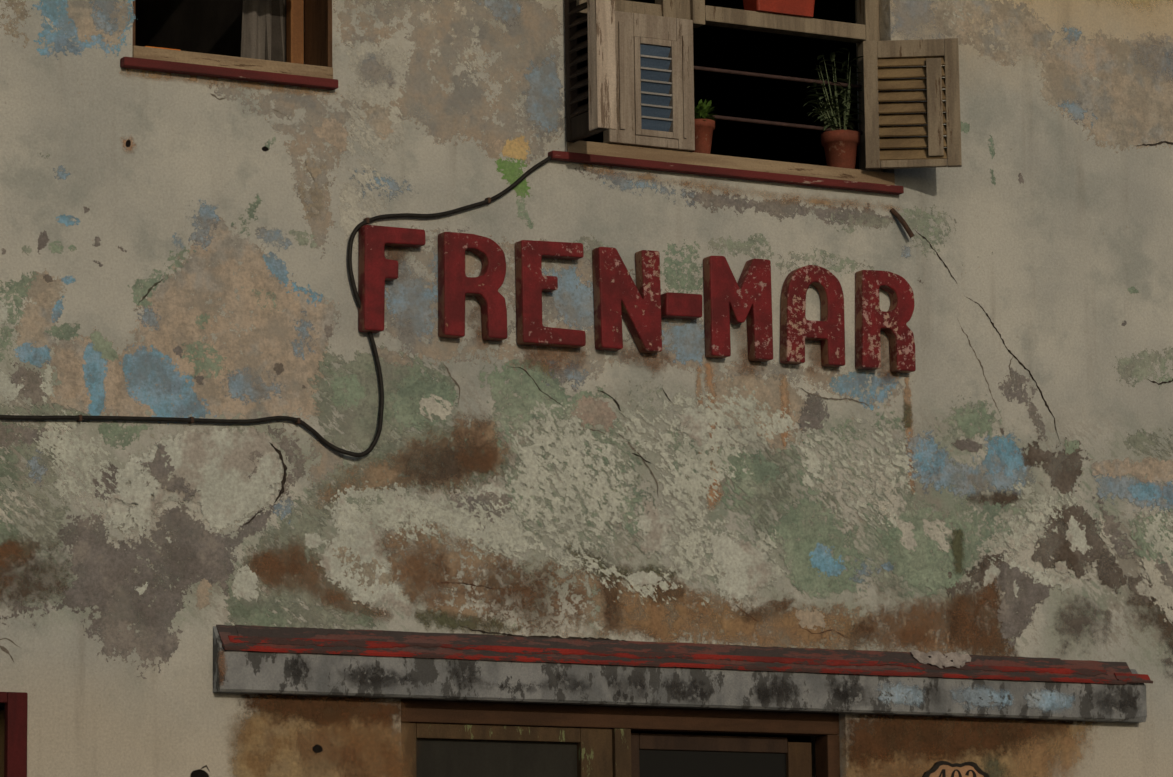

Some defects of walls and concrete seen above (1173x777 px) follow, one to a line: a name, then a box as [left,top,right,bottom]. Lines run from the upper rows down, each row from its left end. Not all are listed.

peeling [32,0,136,60]
peeling [891,0,1173,153]
crack [915,230,1060,441]
peeling [0,83,1173,684]
peeling [878,683,923,706]
peeling [952,686,1012,708]
peeling [1025,689,1073,711]